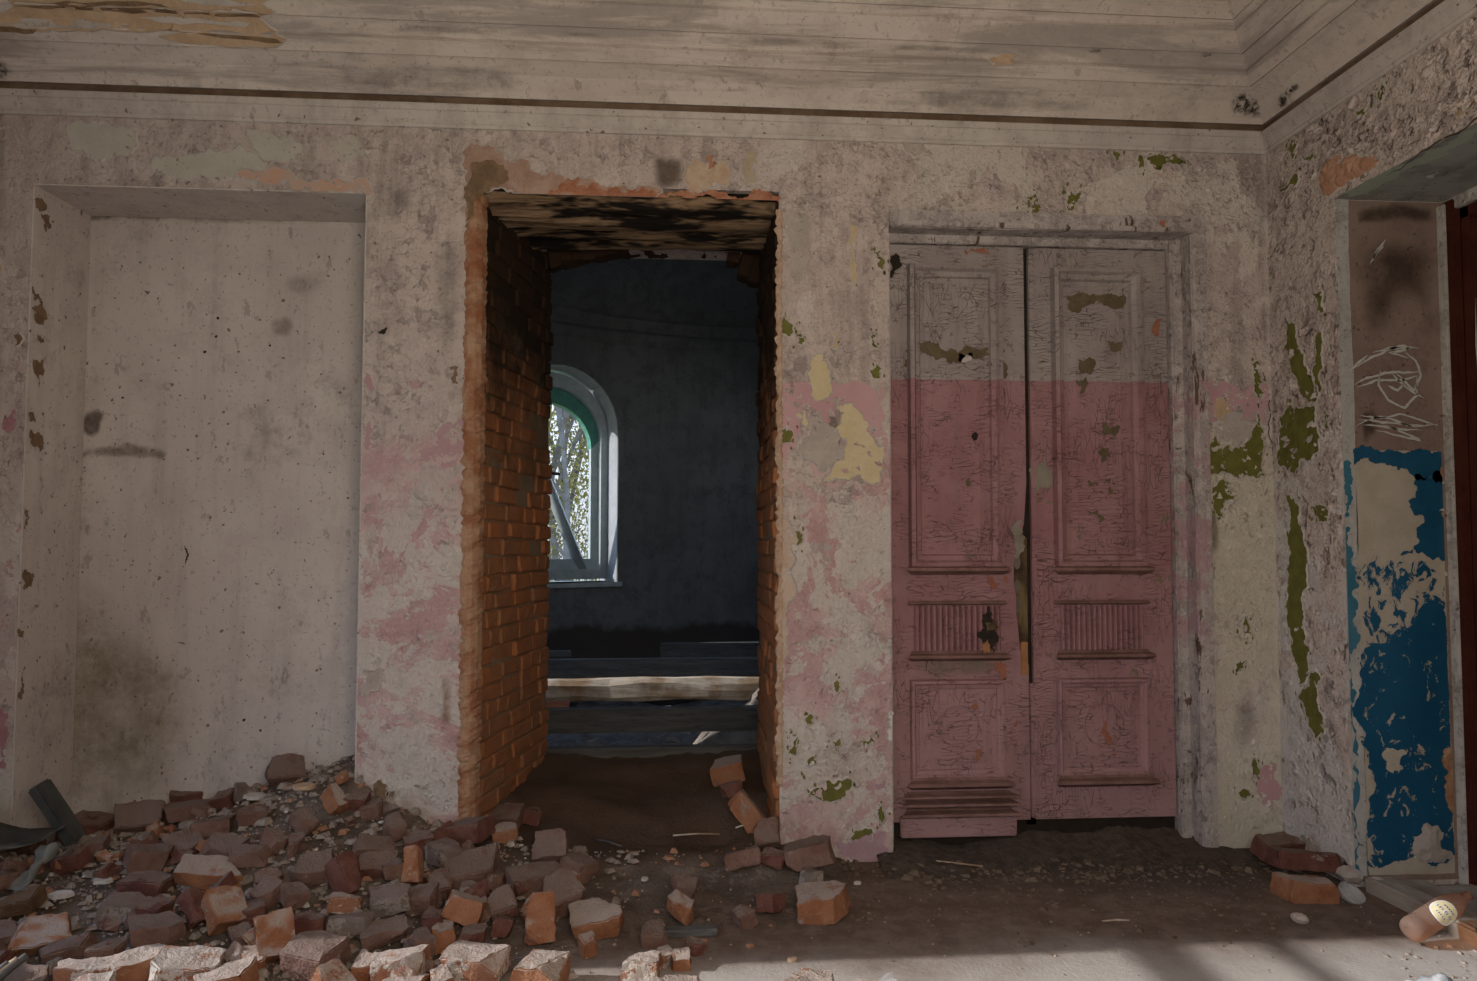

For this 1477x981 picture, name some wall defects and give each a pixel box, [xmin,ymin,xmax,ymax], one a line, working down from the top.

peeling [0,0,288,49]
flaking render [418,141,894,862]
peeling [1210,284,1455,876]